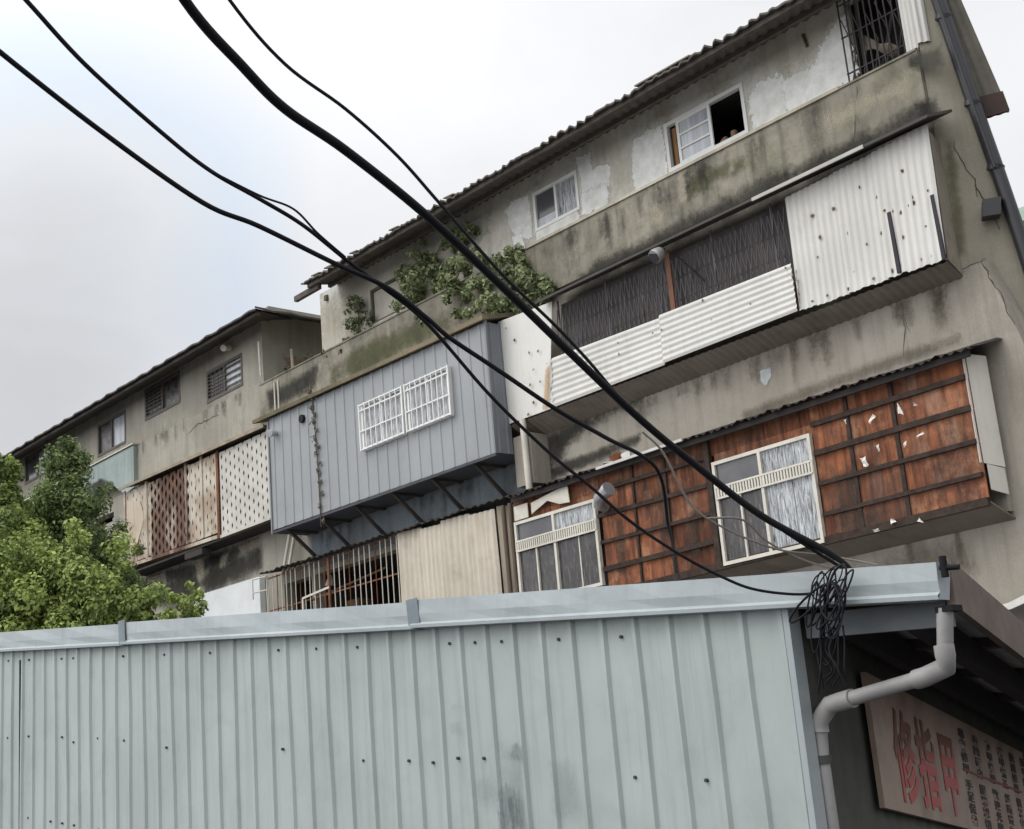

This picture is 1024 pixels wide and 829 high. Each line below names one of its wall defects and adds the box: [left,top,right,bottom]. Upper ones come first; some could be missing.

peeling [746,15,860,129]
damp [909,48,943,70]
peeling [503,152,611,249]
peeling [631,124,668,190]
damp [578,99,937,284]
crack [954,141,1000,229]
crack [963,259,1015,324]
damp [756,363,772,386]
damp [135,539,262,608]